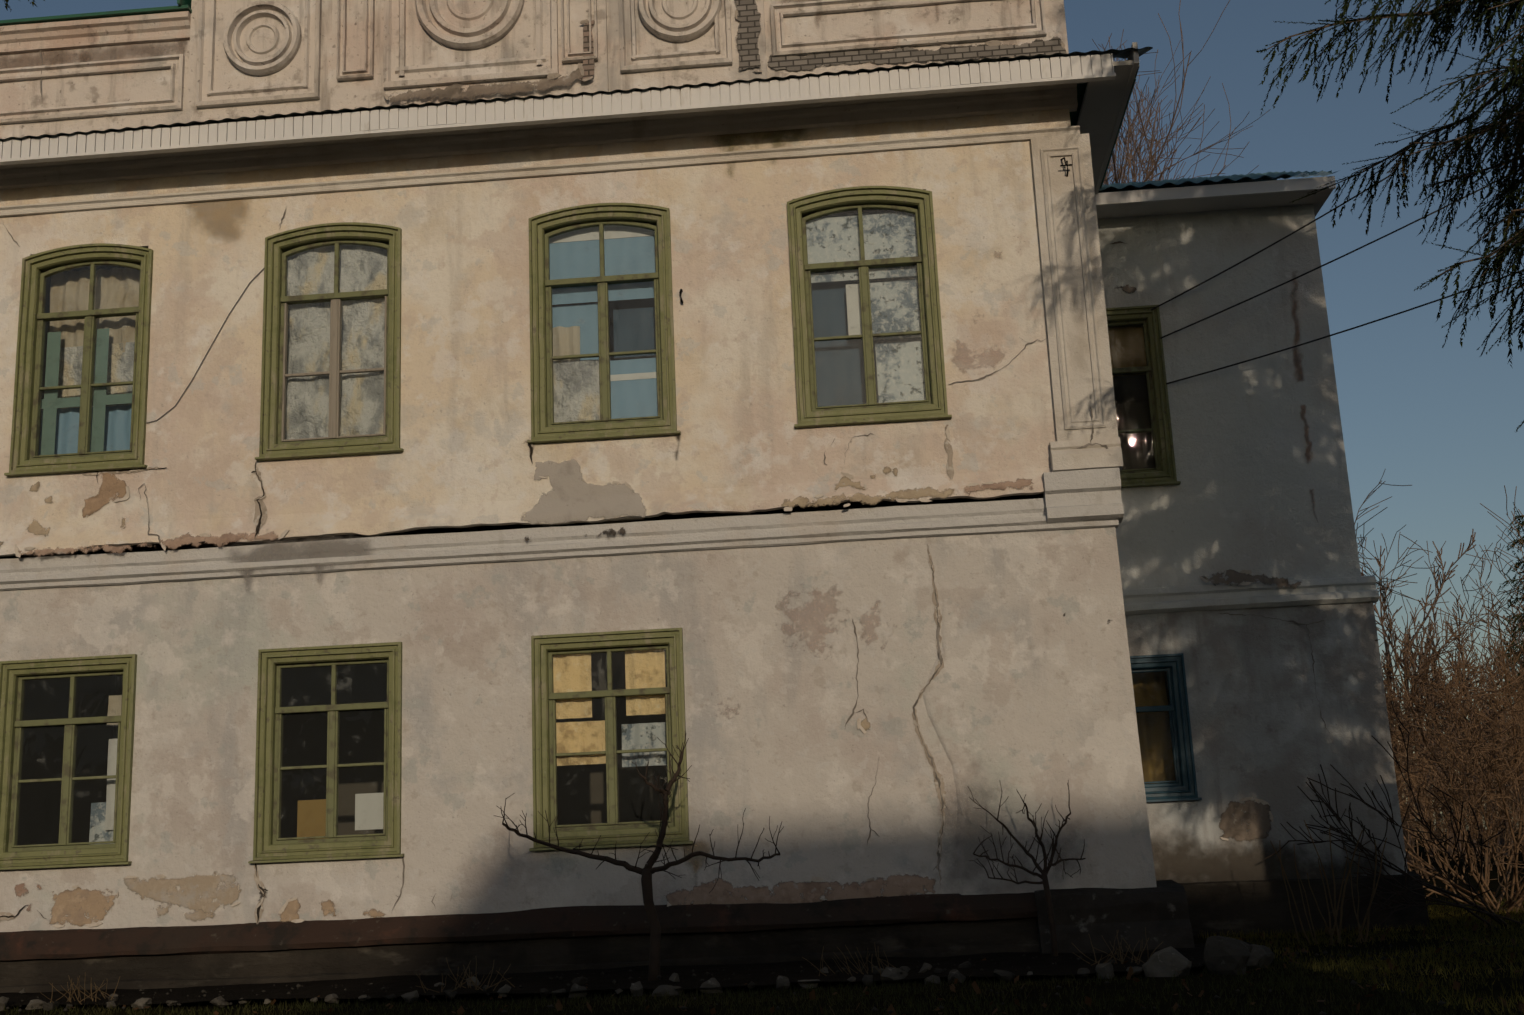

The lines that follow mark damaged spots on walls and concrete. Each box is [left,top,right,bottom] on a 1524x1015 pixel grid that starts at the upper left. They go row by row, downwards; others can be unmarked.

spalling [734,0,1067,72]
spalling [0,471,289,557]
spalling [1199,569,1302,589]
crack [845,619,867,727]
crack [912,545,949,885]
crack [867,768,878,844]
spalling [1219,797,1273,842]
spalling [15,871,241,928]
spalling [278,897,305,923]
spalling [321,900,336,916]
spalling [666,874,935,907]